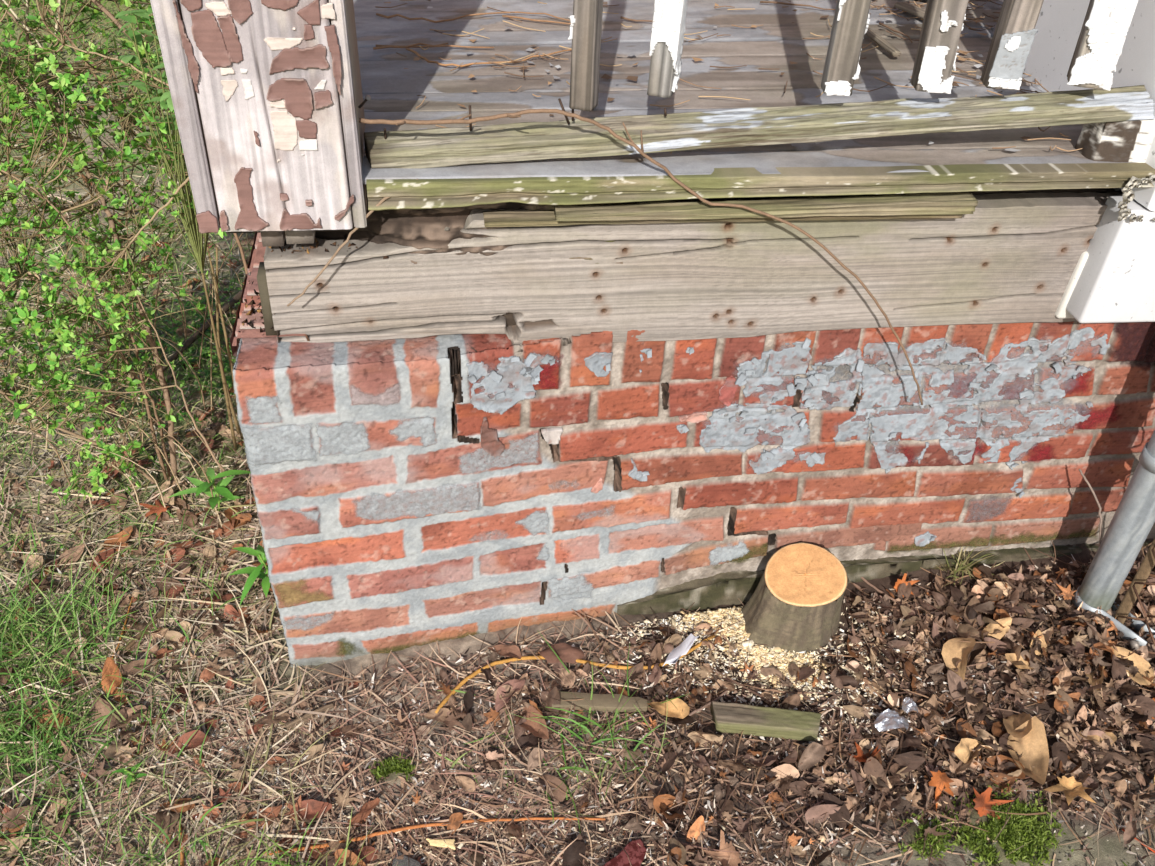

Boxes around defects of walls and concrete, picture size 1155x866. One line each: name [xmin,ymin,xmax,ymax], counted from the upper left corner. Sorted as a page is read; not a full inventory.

peeling [173,0,342,163]
peeling [196,167,322,233]
peeling [335,194,354,221]
crack [447,344,483,444]
peeling [466,353,558,458]
peeling [584,352,613,377]
crack [661,382,670,410]
peeling [676,327,1111,498]
crack [540,428,622,492]
crack [677,487,686,509]
crack [727,507,777,546]
crack [540,564,569,605]